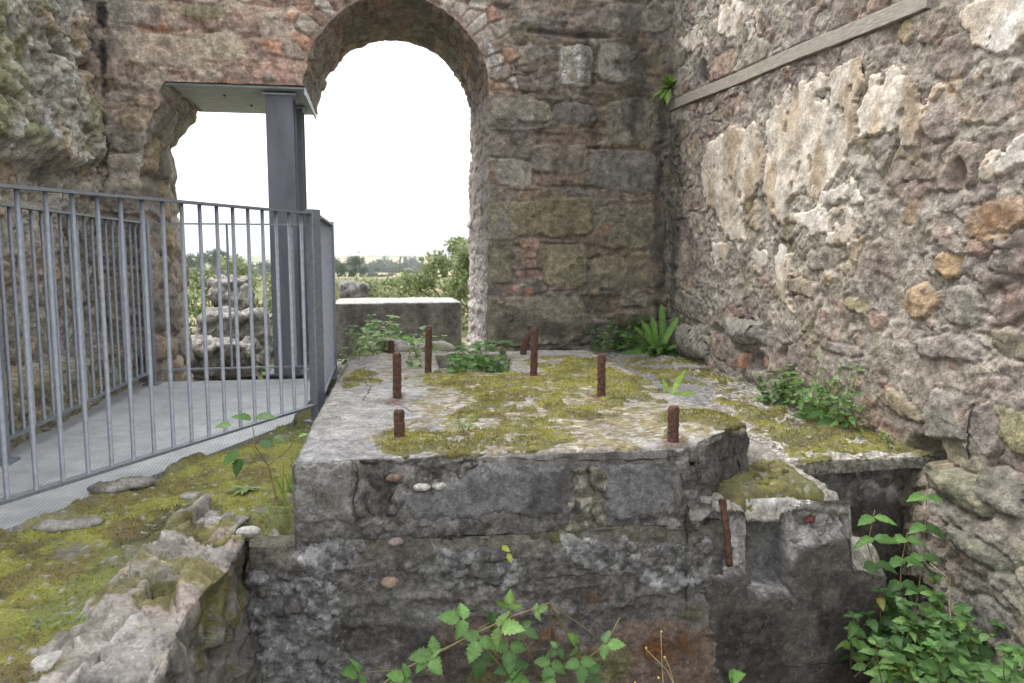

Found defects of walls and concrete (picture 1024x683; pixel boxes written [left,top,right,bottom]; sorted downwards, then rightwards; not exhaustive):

flaking render [959,0,1024,57]
flaking render [700,55,945,314]
flaking render [979,133,1024,183]
crack [966,401,975,460]